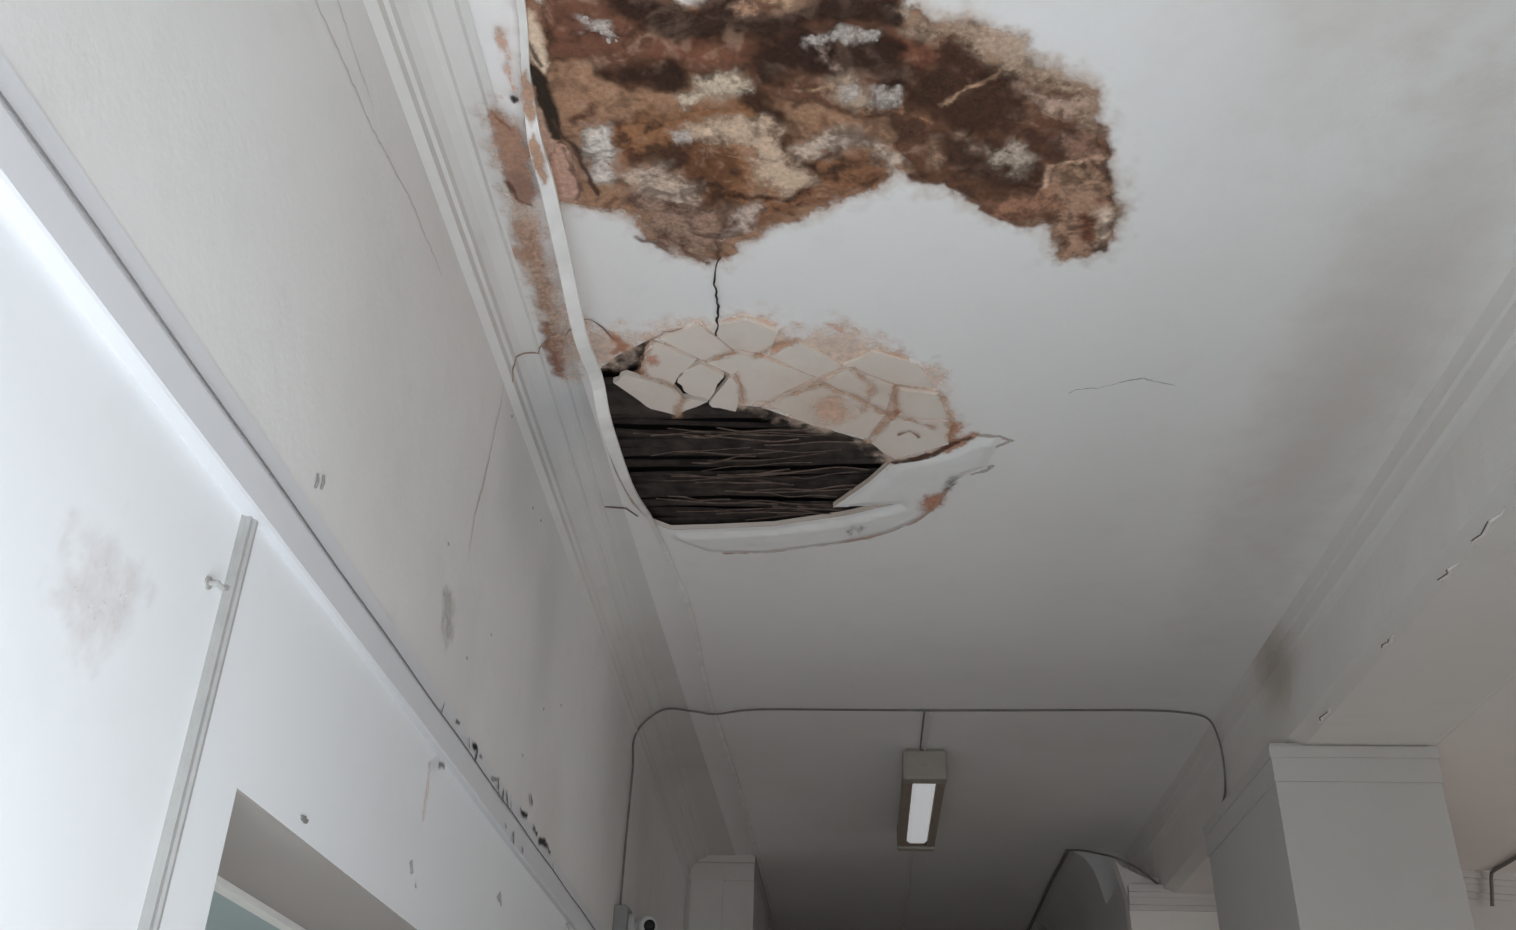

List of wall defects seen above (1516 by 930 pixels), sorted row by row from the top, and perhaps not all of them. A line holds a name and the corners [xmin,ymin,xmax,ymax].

crack [315,0,442,275]
spalling [525,0,600,203]
spalling [597,316,953,530]